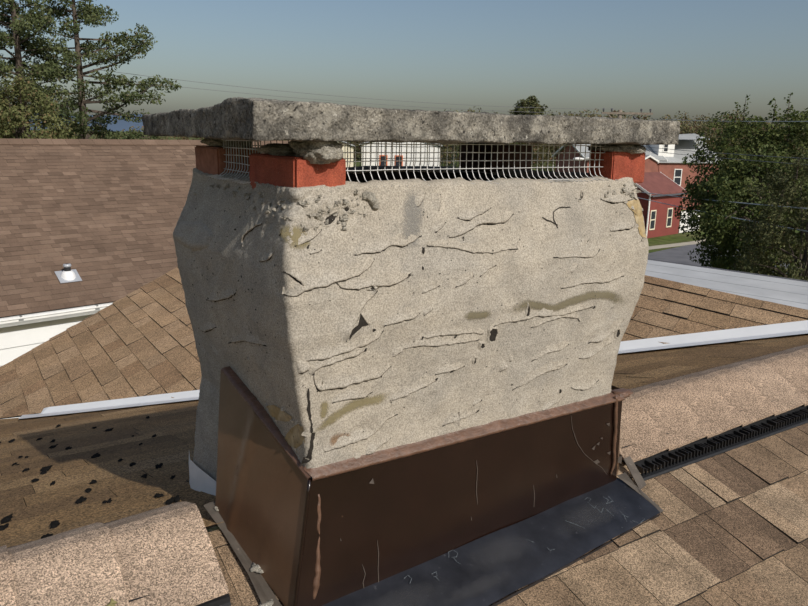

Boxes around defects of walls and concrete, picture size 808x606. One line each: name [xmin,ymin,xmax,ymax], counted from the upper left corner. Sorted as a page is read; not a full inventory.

crack [241,214,264,247]
spalling [190,180,367,231]
crack [600,179,637,231]
crack [260,190,624,466]
water stain [467,311,490,320]
water stain [515,291,619,311]
peeling [265,403,318,454]
water stain [321,395,383,428]